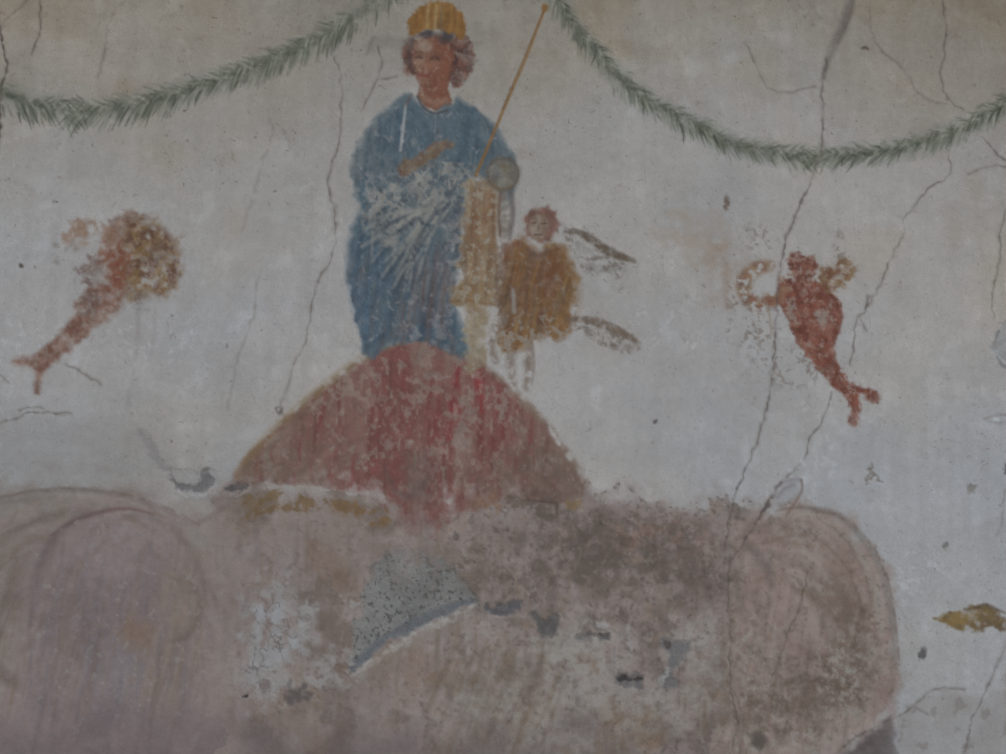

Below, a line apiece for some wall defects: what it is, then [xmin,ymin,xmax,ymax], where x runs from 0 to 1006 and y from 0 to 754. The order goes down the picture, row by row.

crack [0,0,44,148]
crack [273,45,399,421]
crack [846,136,1006,368]
crack [0,373,74,426]
crack [62,361,104,388]
crack [721,39,834,754]
spalling [135,428,252,503]
spalling [225,541,634,720]
spalling [613,668,645,699]
spalling [656,635,694,691]
crack [830,649,1006,754]